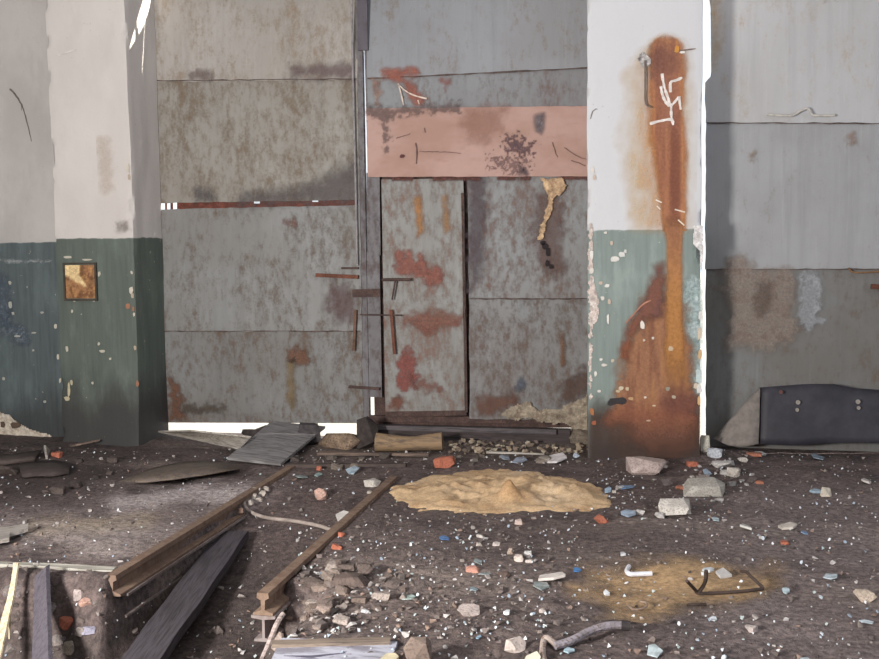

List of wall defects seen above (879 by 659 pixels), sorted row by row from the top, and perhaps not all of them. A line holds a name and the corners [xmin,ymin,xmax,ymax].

corrosion [373,67,427,105]
crack [9,88,32,141]
corrosion [392,250,444,285]
corrosion [591,38,701,459]
corrosion [404,311,463,335]
peeling [587,223,614,425]
corrosion [390,346,442,409]
peeling [607,386,633,406]
flaking render [0,412,51,437]